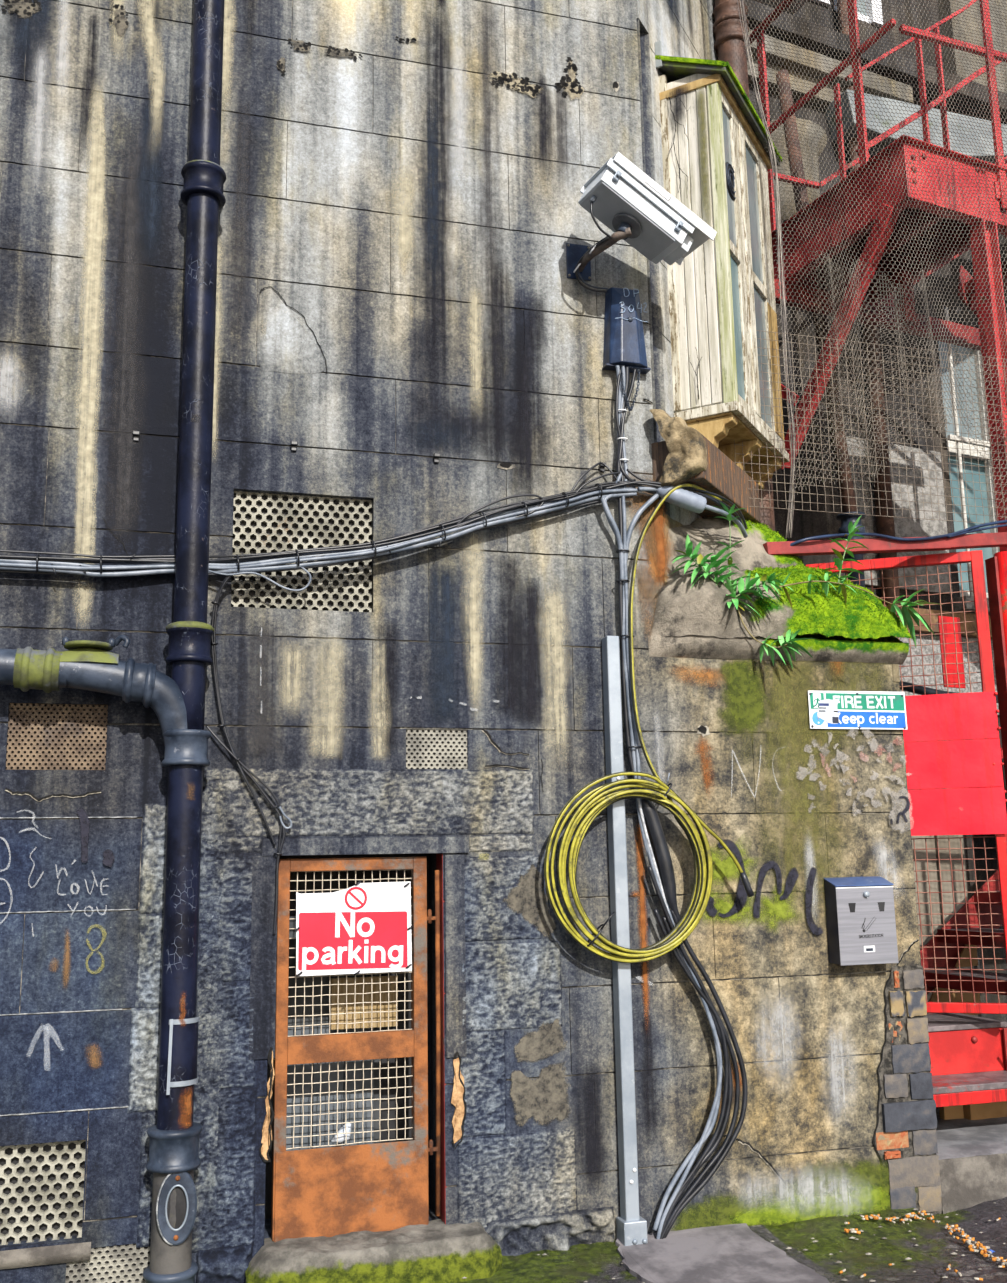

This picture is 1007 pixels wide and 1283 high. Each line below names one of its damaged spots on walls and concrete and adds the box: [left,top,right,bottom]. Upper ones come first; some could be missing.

leakage [222,0,254,94]
spalling [489,57,584,100]
leakage [398,0,462,369]
leakage [76,0,163,564]
crack [259,286,327,374]
leakage [470,14,545,484]
corrosion [648,498,668,581]
leakage [498,561,565,743]
peeling [797,729,913,833]
corrosion [181,1091,192,1126]
spalling [259,1047,275,1162]
spalling [451,1051,467,1149]